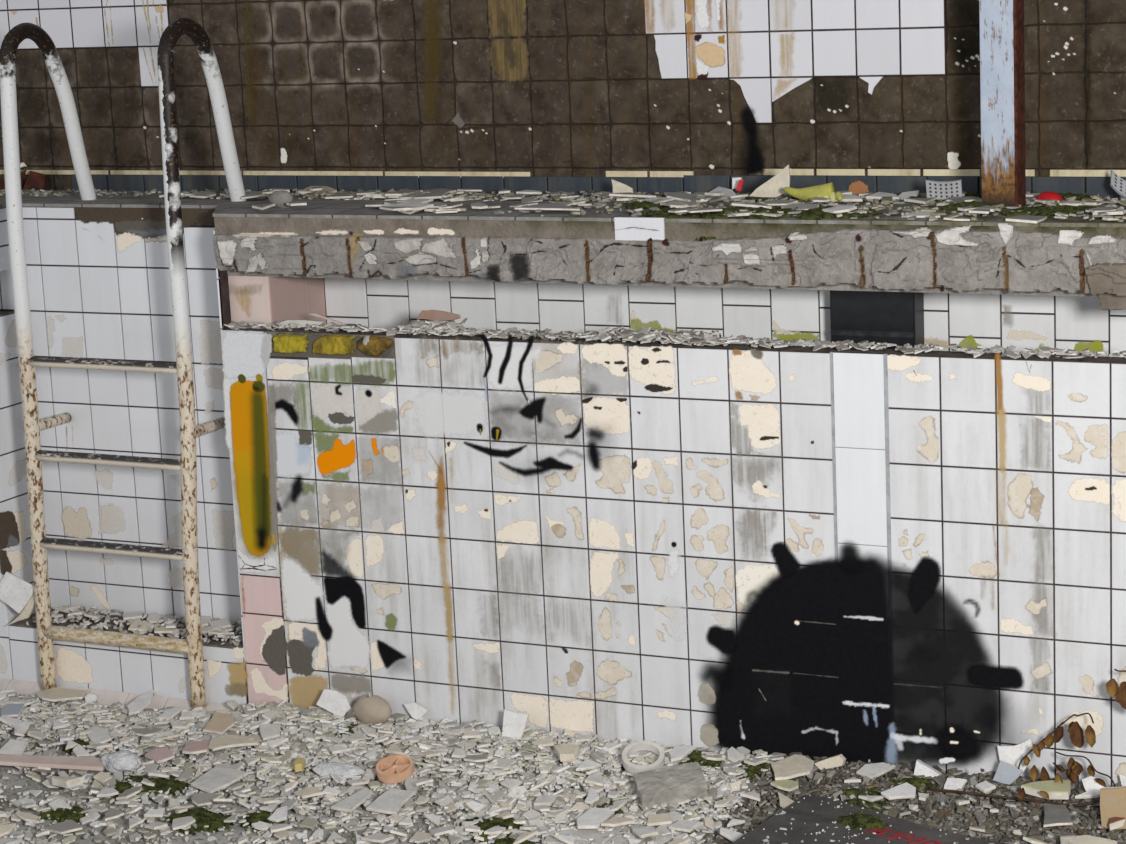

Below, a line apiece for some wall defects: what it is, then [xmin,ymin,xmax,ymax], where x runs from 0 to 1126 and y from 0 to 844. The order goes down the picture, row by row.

rust [142,0,167,82]
spalling [75,202,167,239]
flaking render [316,227,489,270]
rust [645,239,654,283]
rust [788,250,796,285]
flaking render [893,225,979,246]
rust [931,232,944,291]
rust [996,354,1005,471]
spalling [0,511,20,575]
rust [436,463,452,640]
peeling [496,507,635,645]
peeling [632,457,780,612]